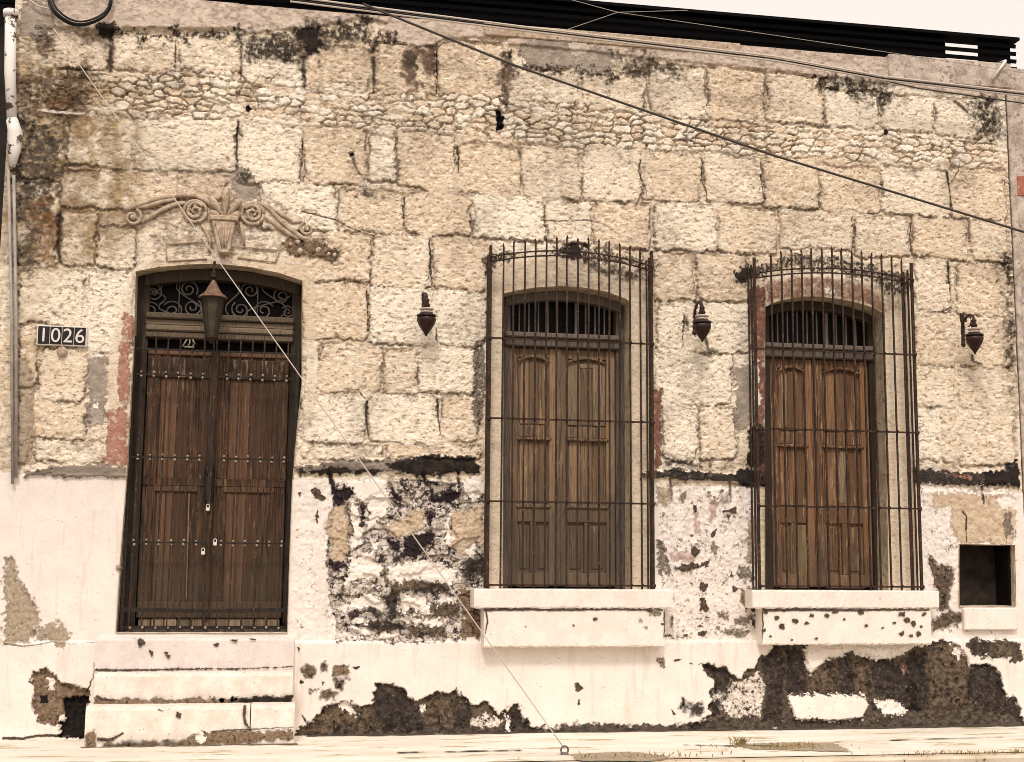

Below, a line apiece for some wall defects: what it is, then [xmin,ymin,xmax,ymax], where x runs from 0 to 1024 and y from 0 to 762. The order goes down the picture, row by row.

water stain [92,14,439,93]
water stain [10,37,94,278]
peeling [91,312,134,466]
flaking render [0,556,73,648]
peeling [298,473,490,645]
flaking render [639,482,1024,730]
flaking render [28,638,550,747]